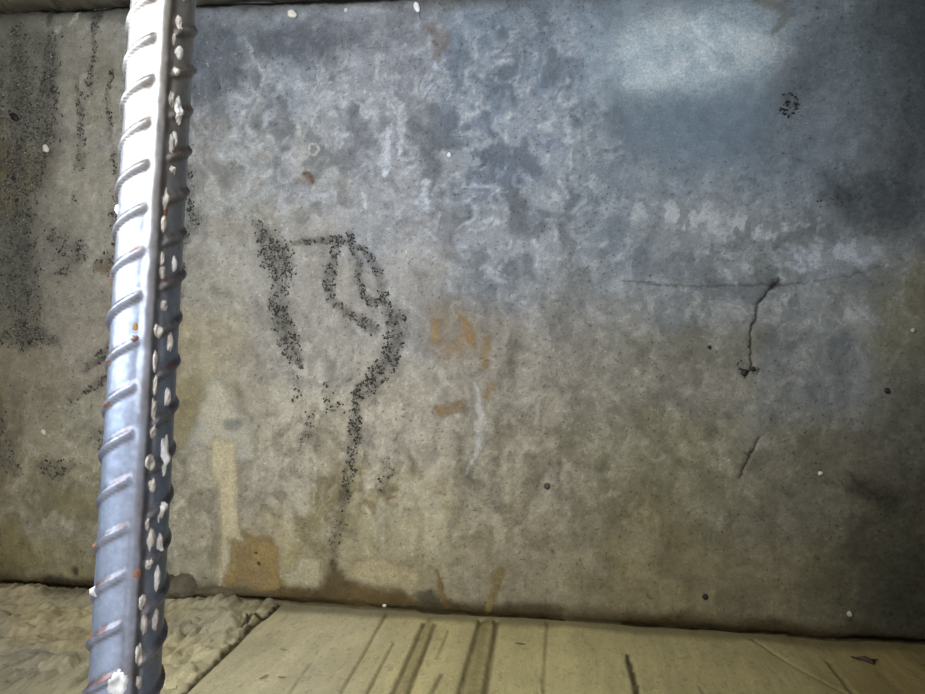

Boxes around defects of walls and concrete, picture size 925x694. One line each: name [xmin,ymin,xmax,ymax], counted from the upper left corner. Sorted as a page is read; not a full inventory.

crack [35,6,130,14]
crack [196,0,398,8]
leakage [0,9,114,352]
crack [744,278,779,378]
leakage [251,219,407,546]
crack [738,437,759,478]
leakage [280,556,561,620]
leakage [627,617,809,634]